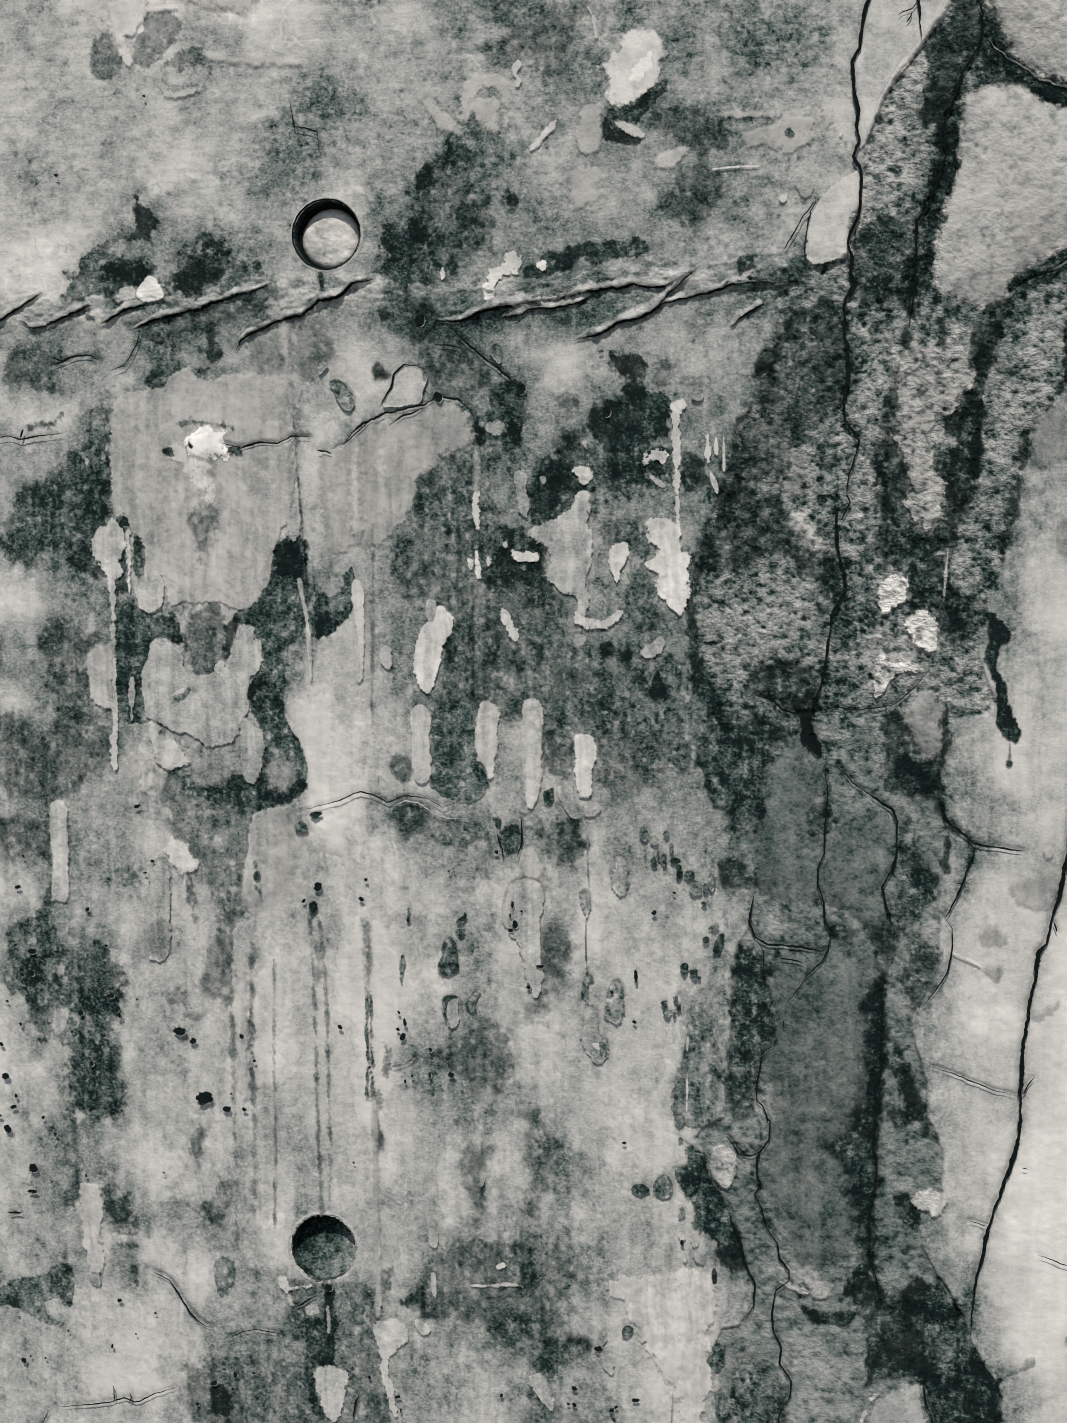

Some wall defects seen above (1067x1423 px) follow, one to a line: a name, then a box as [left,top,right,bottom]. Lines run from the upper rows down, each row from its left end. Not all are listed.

water stain [0,400,114,579]
spalling [115,515,356,834]
crack [223,331,521,454]
spalling [413,599,489,804]
peeling [500,608,519,641]
peeling [503,438,630,629]
crack [726,0,933,1423]
water stain [779,0,1067,1423]
crack [924,794,1021,1005]
water stain [3,882,128,1208]
crack [929,854,1067,1329]
water stain [604,1226,790,1423]